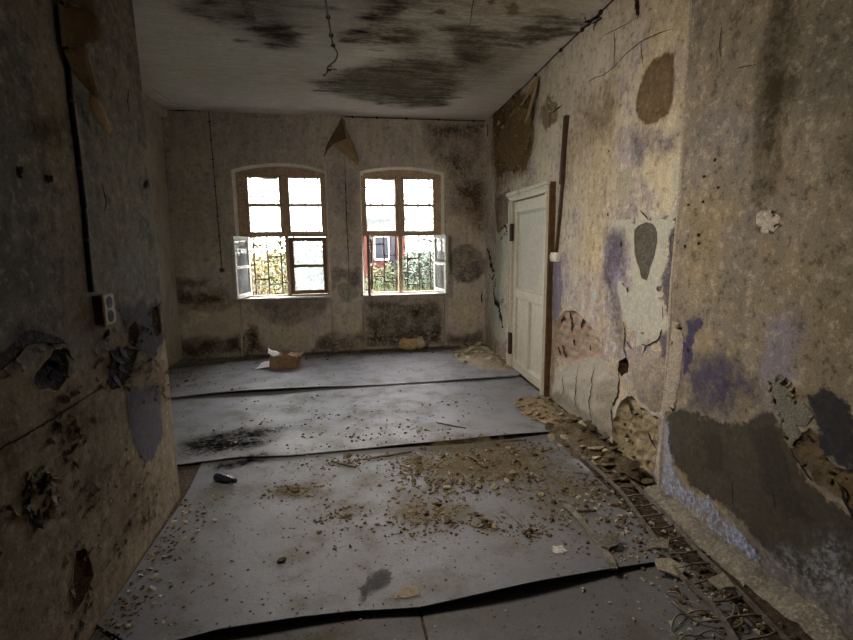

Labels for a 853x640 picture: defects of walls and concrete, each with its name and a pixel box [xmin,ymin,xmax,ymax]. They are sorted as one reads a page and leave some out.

water stain [344,0,415,43]
water stain [317,16,578,107]
water stain [636,53,674,124]
peeling [0,330,90,469]
spalling [93,303,173,402]
water stain [368,300,440,343]
crack [481,225,508,328]
spalling [552,309,604,363]
peeling [608,214,683,478]
spalling [766,374,853,510]
water stain [661,409,853,608]
spalling [64,534,111,638]